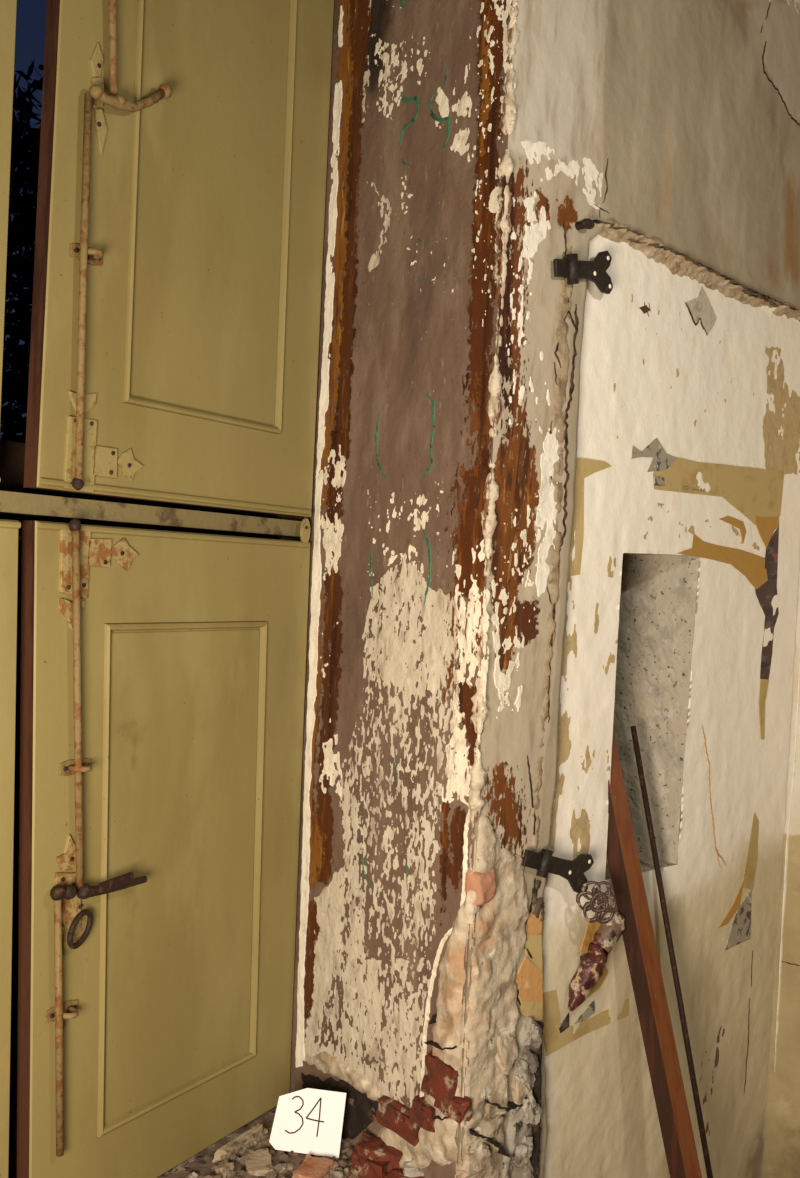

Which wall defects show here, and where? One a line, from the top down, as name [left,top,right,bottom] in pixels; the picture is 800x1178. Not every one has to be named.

corrosion [297,551,343,1019]
corrosion [319,0,374,537]
corrosion [482,762,531,856]
corrosion [440,0,578,766]
peeling [295,0,800,1178]
crack [760,2,800,126]